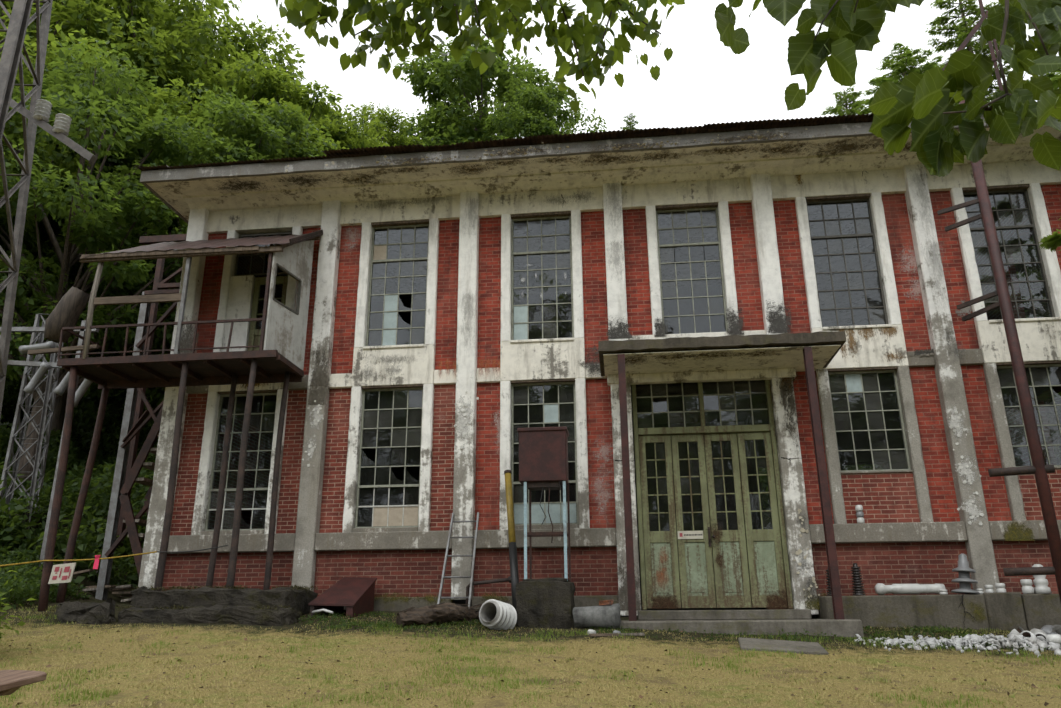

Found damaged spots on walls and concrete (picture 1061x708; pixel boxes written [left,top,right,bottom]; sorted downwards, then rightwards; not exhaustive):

leakage [654,317,668,337]
leakage [726,303,745,335]
leakage [766,300,792,334]
leakage [308,341,330,405]
corrosion [651,554,678,609]